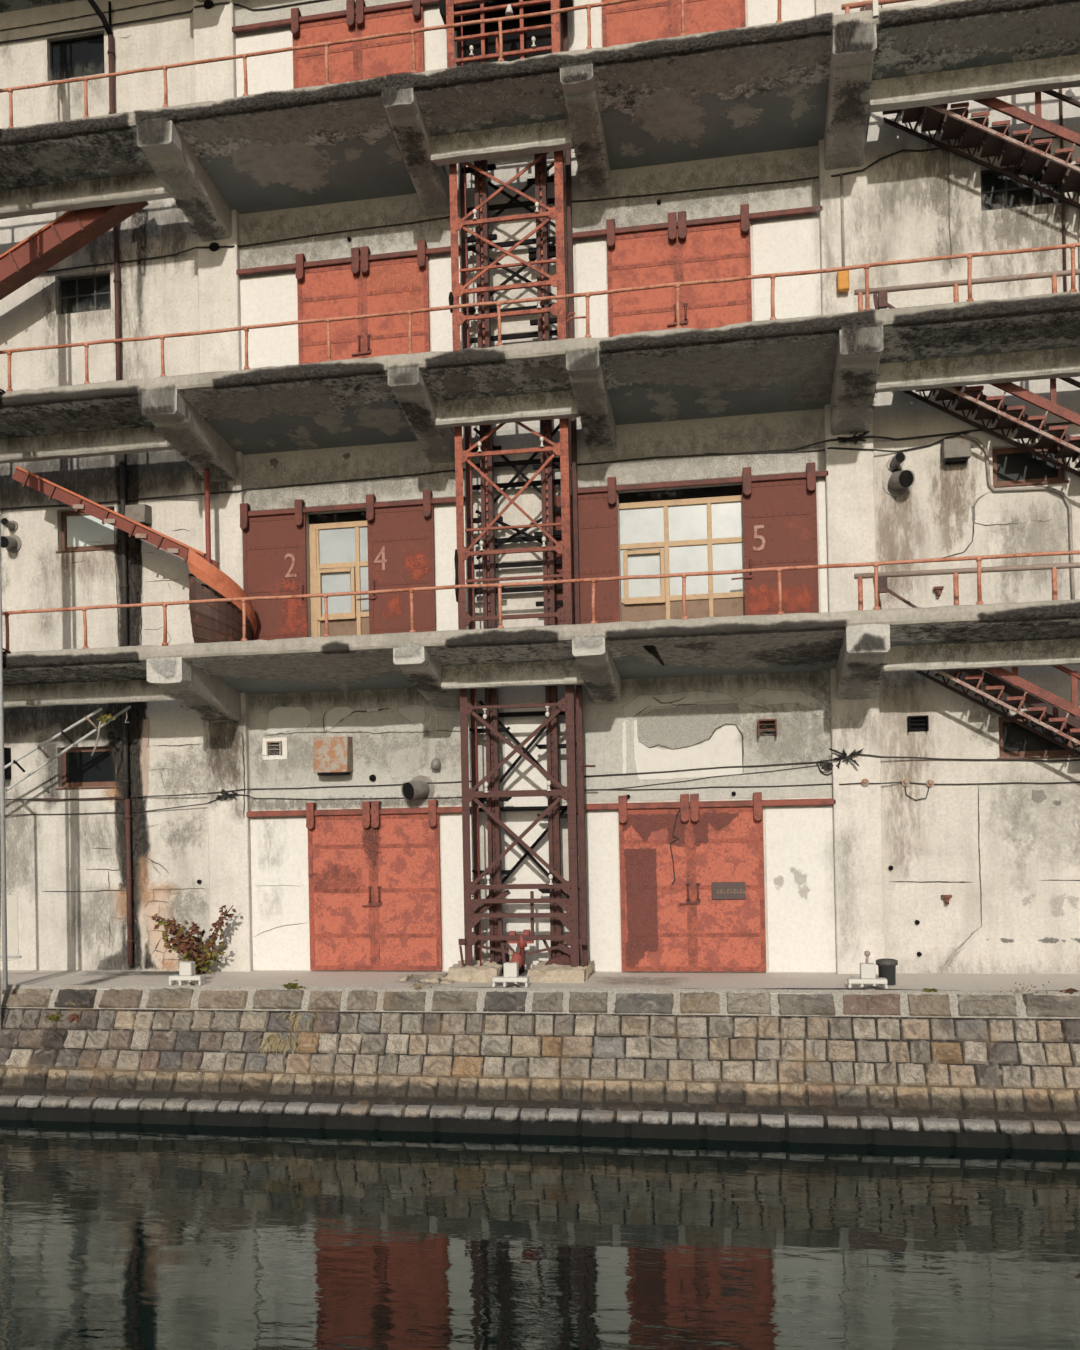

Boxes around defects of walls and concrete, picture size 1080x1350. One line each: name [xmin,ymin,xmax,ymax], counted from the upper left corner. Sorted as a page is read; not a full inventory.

water stain [0,0,1080,147]
water stain [890,151,961,204]
water stain [982,204,1062,246]
water stain [193,348,506,424]
water stain [0,173,242,985]
water stain [196,641,413,705]
spalling [642,645,664,665]
spalling [747,638,887,685]
crack [242,708,460,815]
peeling [586,682,831,780]
corrosion [142,869,174,967]
peeling [1050,893,1079,917]